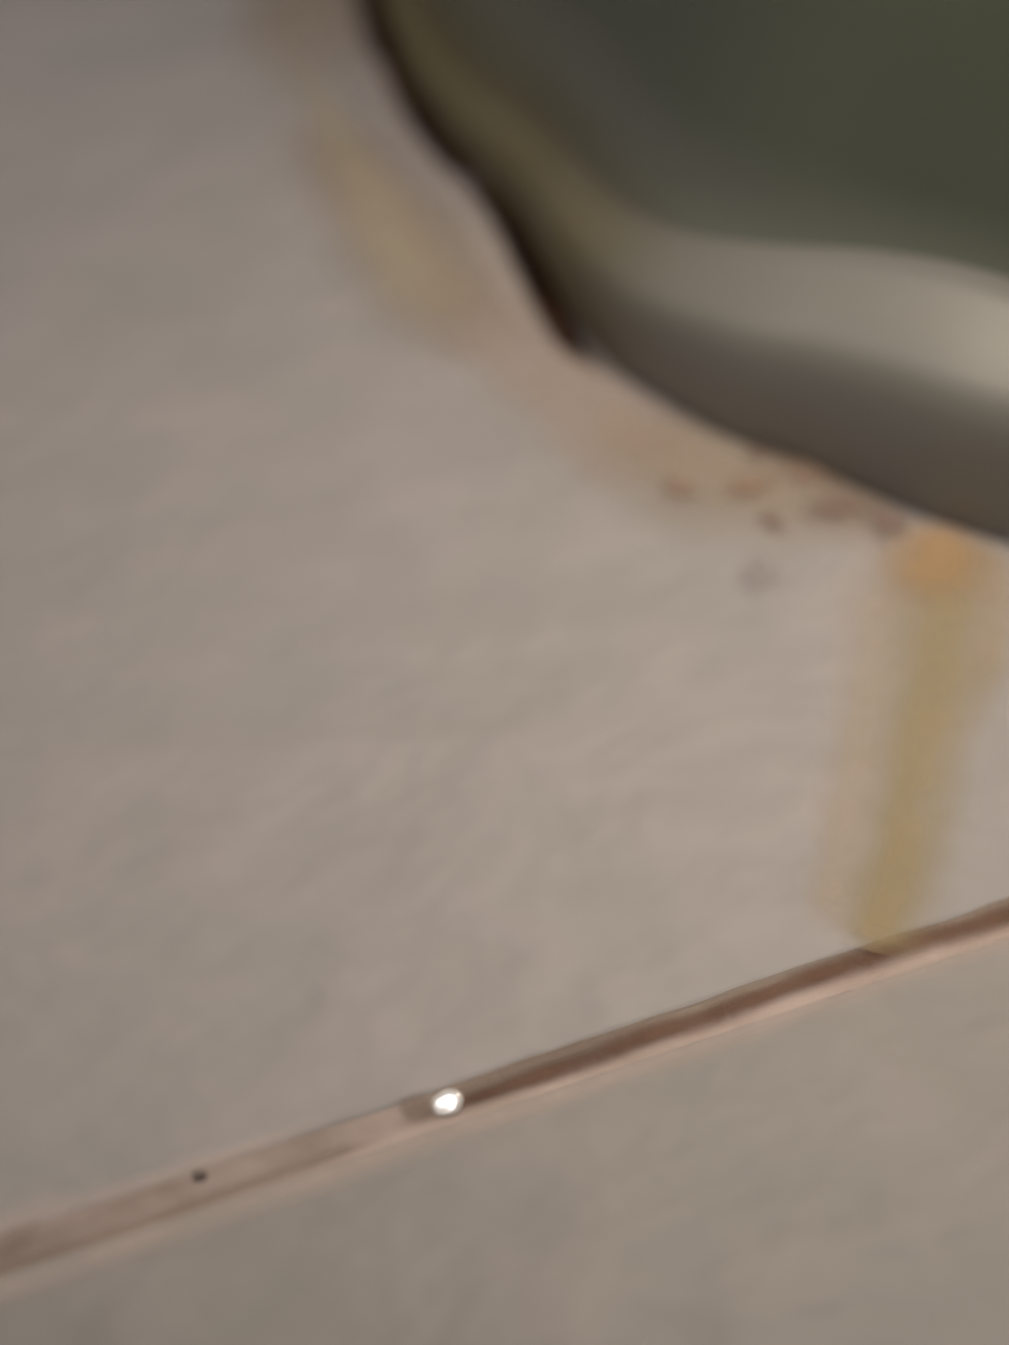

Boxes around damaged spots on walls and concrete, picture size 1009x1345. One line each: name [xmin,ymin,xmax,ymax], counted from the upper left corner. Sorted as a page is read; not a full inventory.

water stain [381,0,584,327]